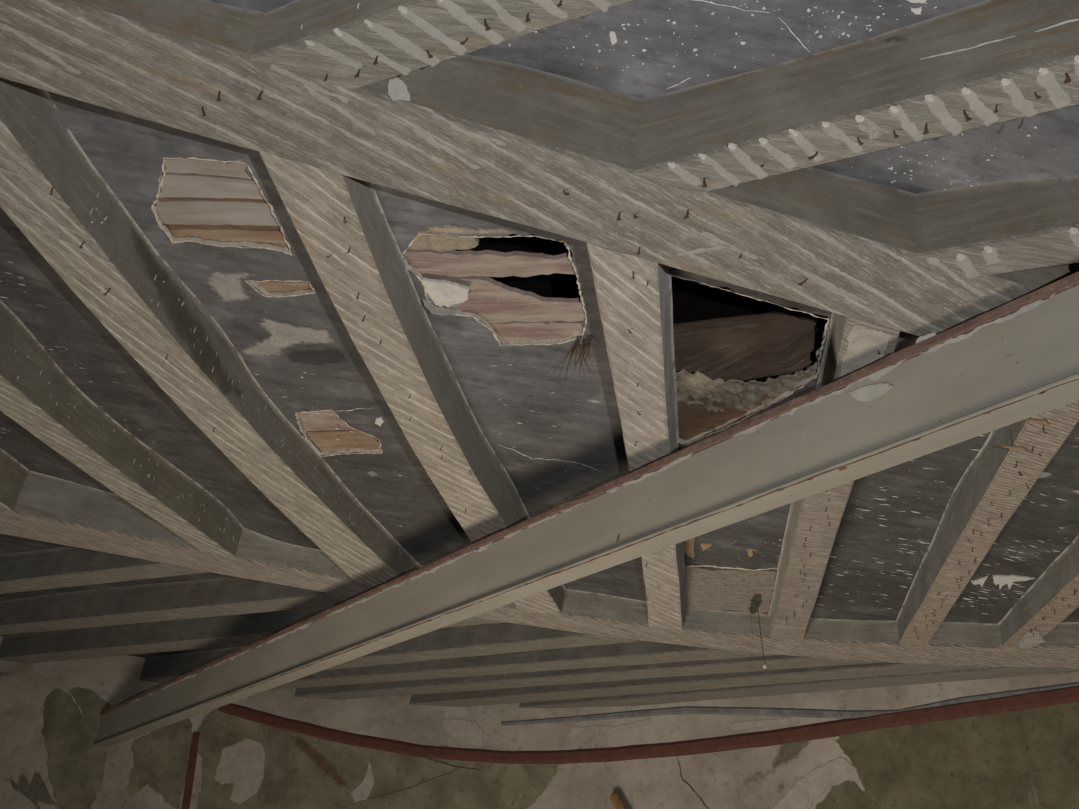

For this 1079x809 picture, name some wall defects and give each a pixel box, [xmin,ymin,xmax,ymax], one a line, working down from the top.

flaking render [151,157,292,255]
peeling [208,272,316,302]
flaking render [402,225,587,346]
peeling [919,293,1056,354]
flaking render [280,386,384,461]
flaking render [606,274,906,493]
peeling [327,502,583,616]
peeling [959,527,1067,614]
peeling [11,687,111,809]
peeling [120,708,559,809]
crack [677,758,709,809]
peeling [816,702,1079,809]